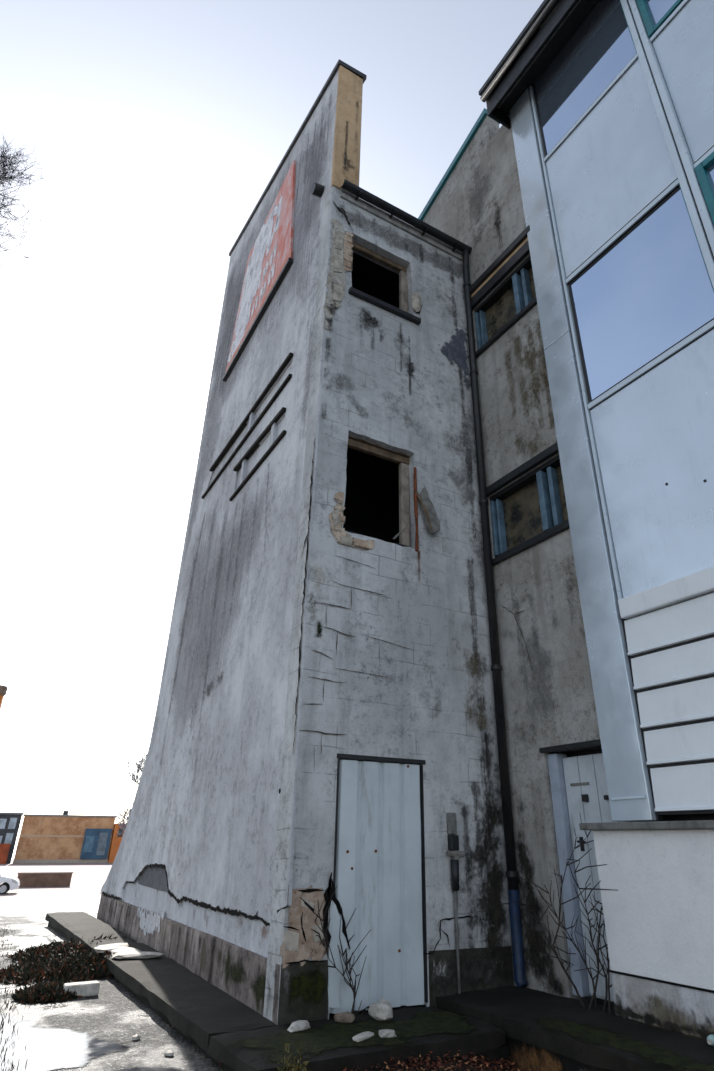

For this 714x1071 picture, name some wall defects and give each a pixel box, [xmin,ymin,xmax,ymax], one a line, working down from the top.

spalling [323,219,354,330]
water stain [505,321,554,428]
water stain [448,368,475,500]
spalling [329,492,374,550]
water stain [466,628,481,680]
spalling [138,867,169,893]
crack [100,863,332,964]
spalling [280,886,326,969]
water stain [431,695,511,993]
water stain [517,832,563,995]
water stain [636,997,714,1040]